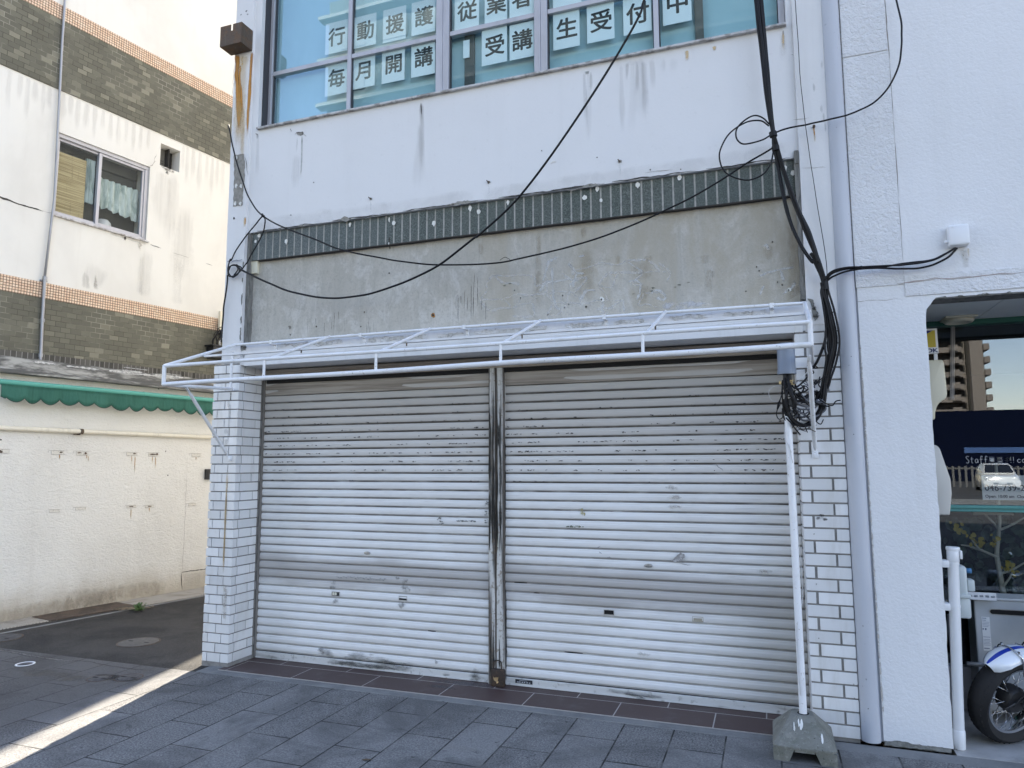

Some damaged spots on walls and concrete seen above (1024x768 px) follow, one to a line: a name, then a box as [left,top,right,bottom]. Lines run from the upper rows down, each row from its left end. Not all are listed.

rust [234,53,253,130]